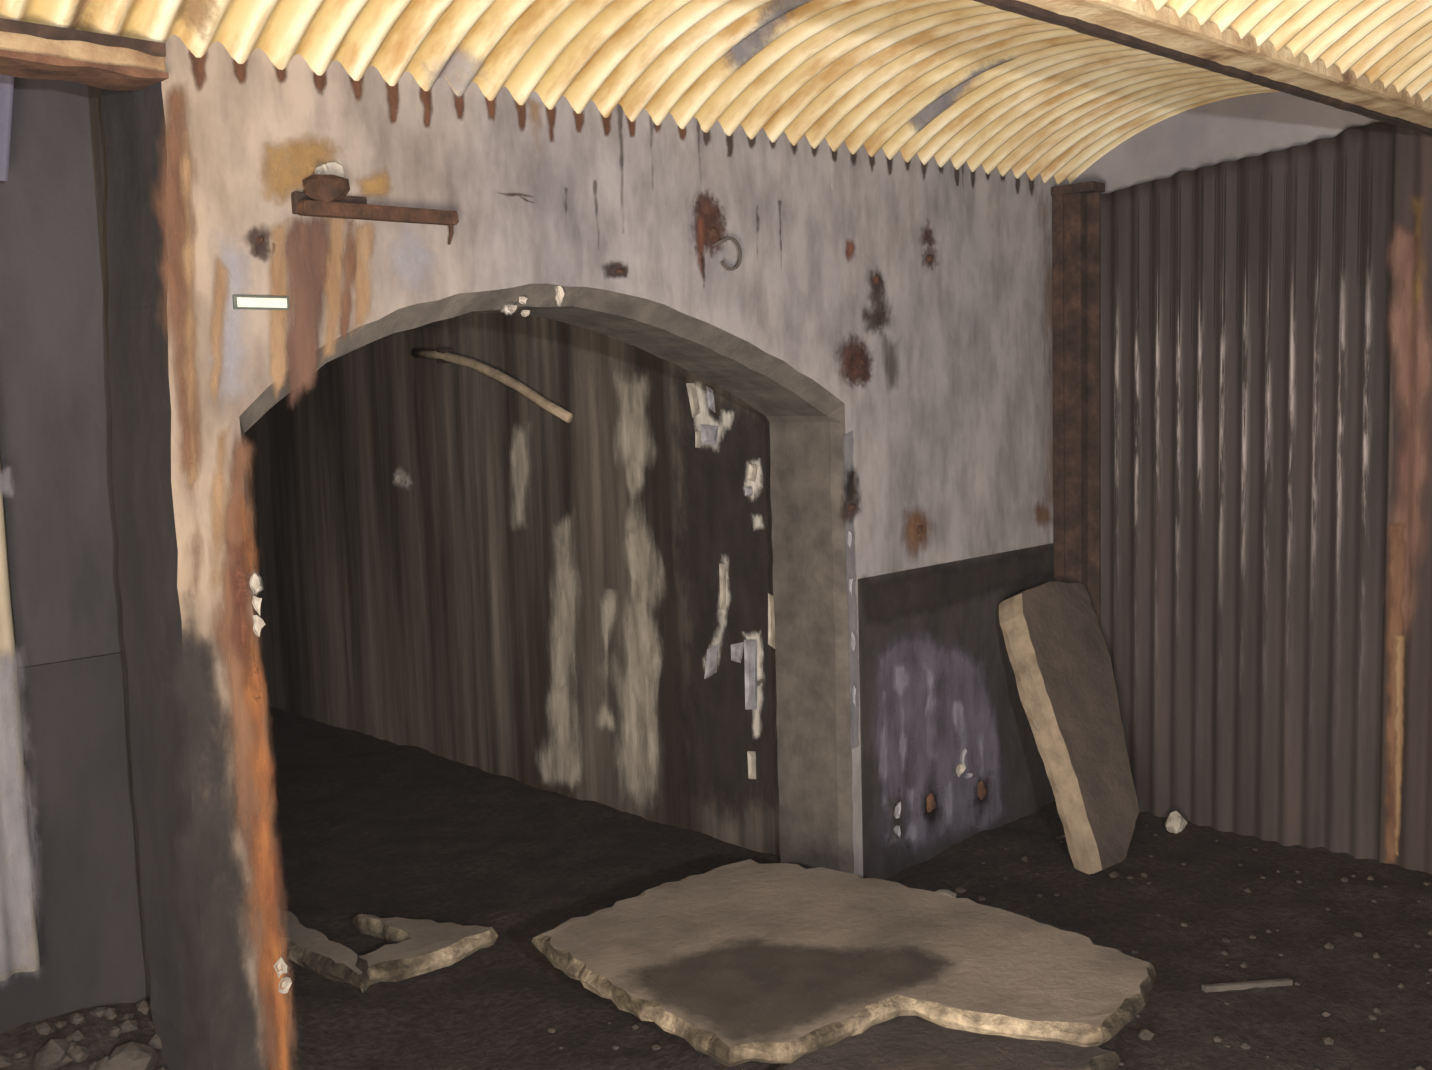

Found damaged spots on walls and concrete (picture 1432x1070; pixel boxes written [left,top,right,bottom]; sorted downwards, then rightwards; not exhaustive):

rust [233,58,247,82]
rust [275,66,286,82]
rust [264,141,333,199]
rust [156,50,227,484]
rust [250,217,374,403]
rust [695,195,725,280]
rust [839,273,895,385]
peeling [686,383,733,448]
peeling [744,461,761,499]
rust [1385,228,1432,864]
peeling [704,558,775,779]
rust [212,436,293,1070]